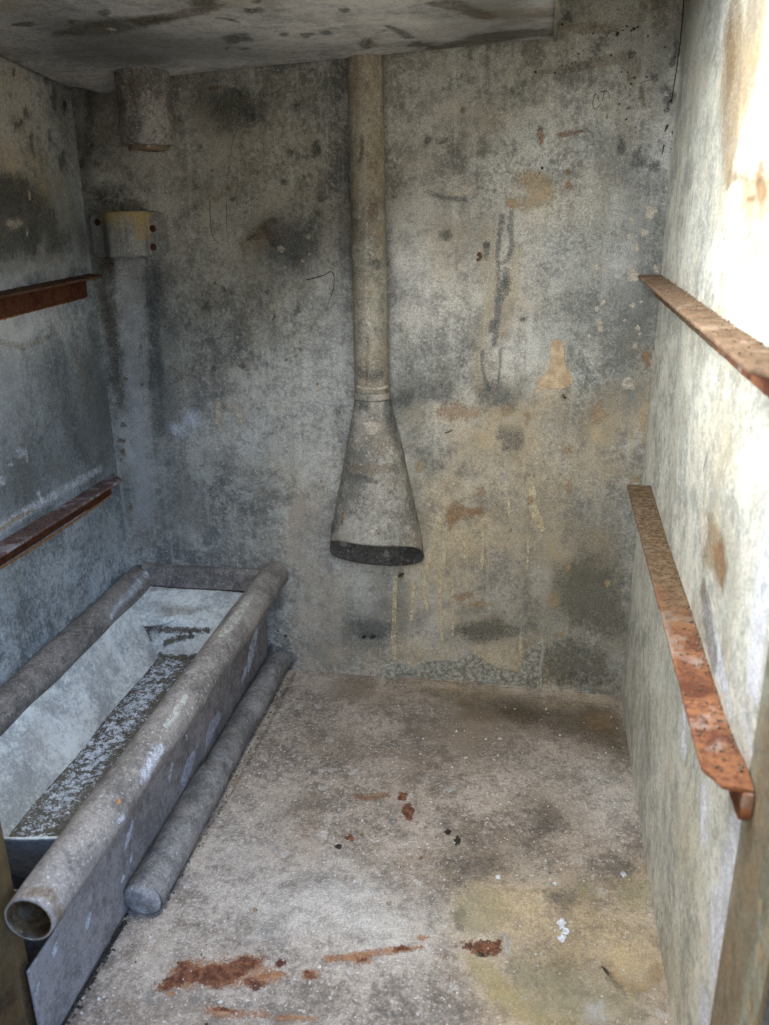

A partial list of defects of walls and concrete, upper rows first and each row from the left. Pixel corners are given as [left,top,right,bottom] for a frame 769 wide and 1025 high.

leakage [55,0,222,40]
leakage [352,503,624,696]
rust [354,792,415,821]
rust [157,954,288,995]
rust [302,935,429,979]
rust [459,939,504,957]
rust [204,1005,316,1021]